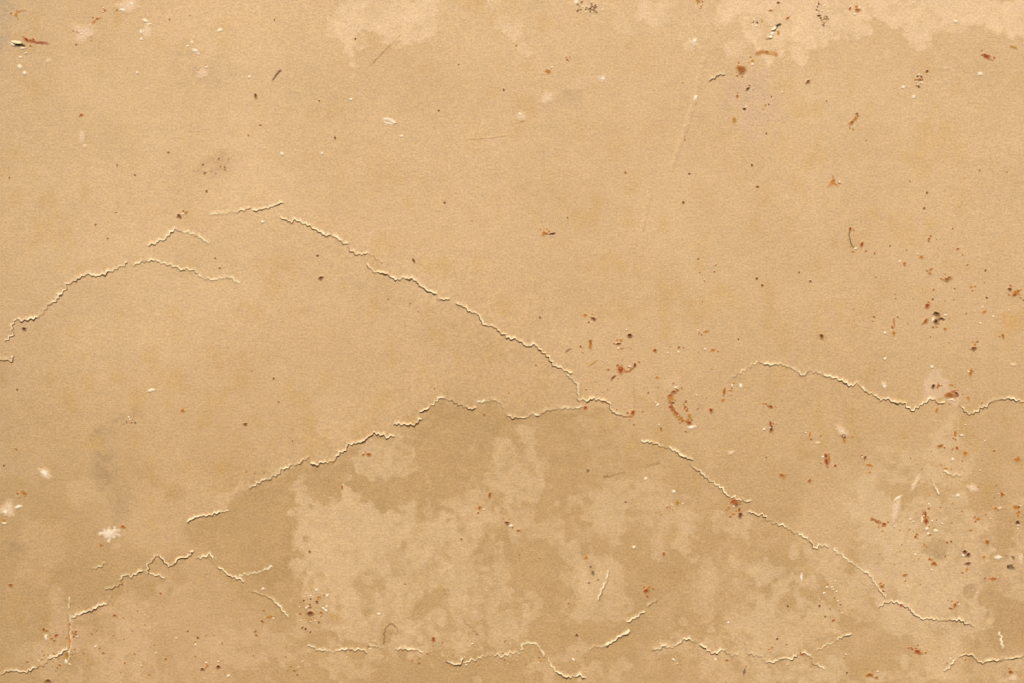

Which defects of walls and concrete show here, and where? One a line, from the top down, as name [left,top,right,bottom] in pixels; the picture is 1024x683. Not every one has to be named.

peeling [25,360,1024,683]
corrosion [667,382,698,433]